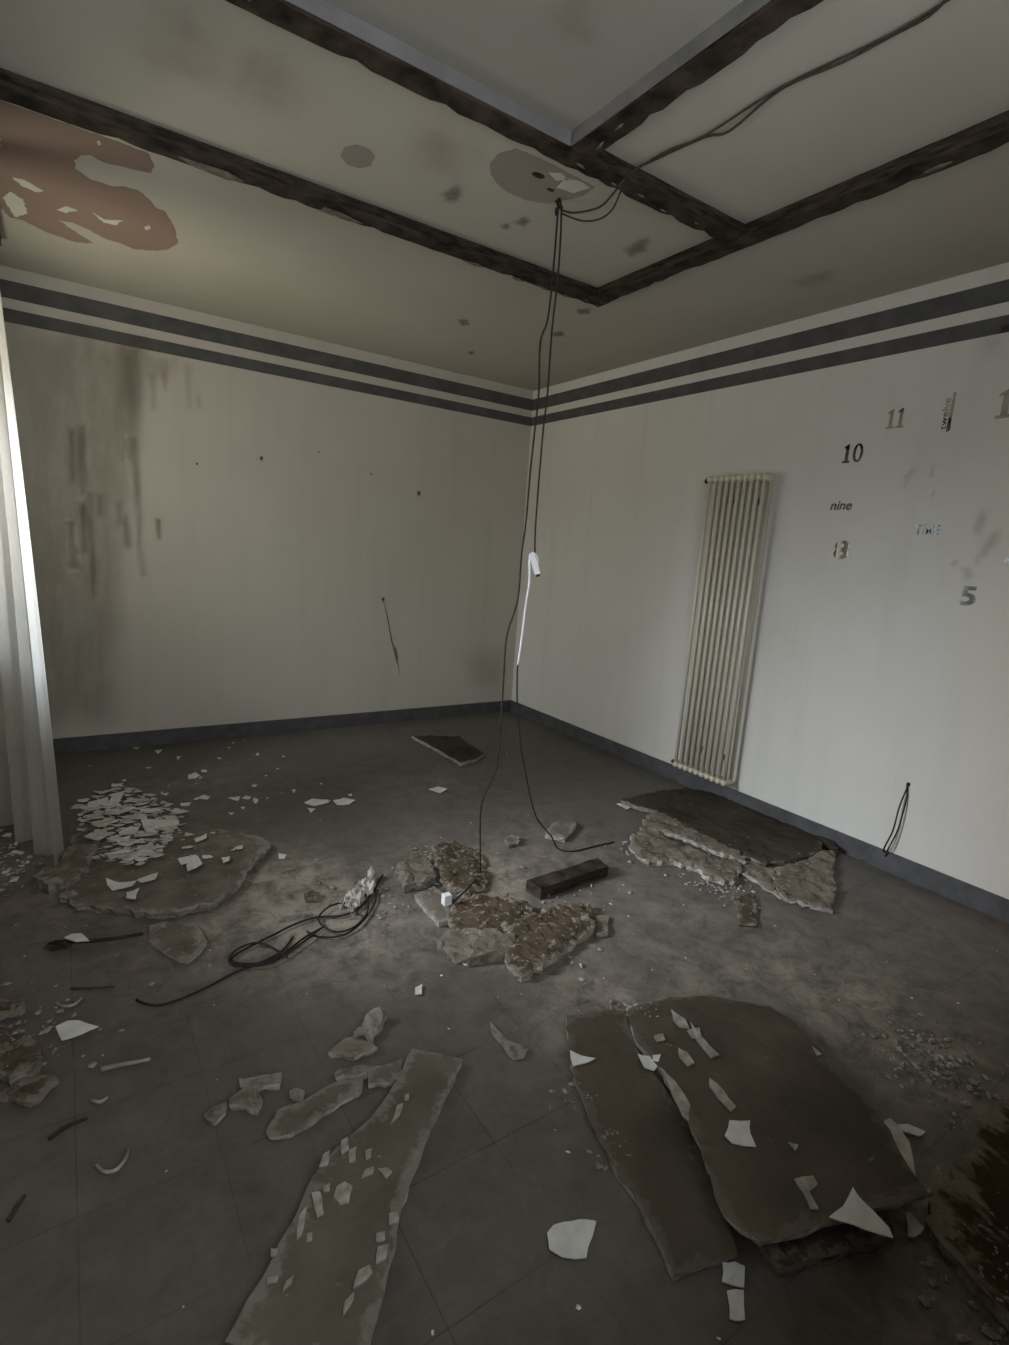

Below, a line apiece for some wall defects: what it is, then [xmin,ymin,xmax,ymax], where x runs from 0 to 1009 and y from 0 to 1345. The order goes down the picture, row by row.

peeling [0,102,178,251]